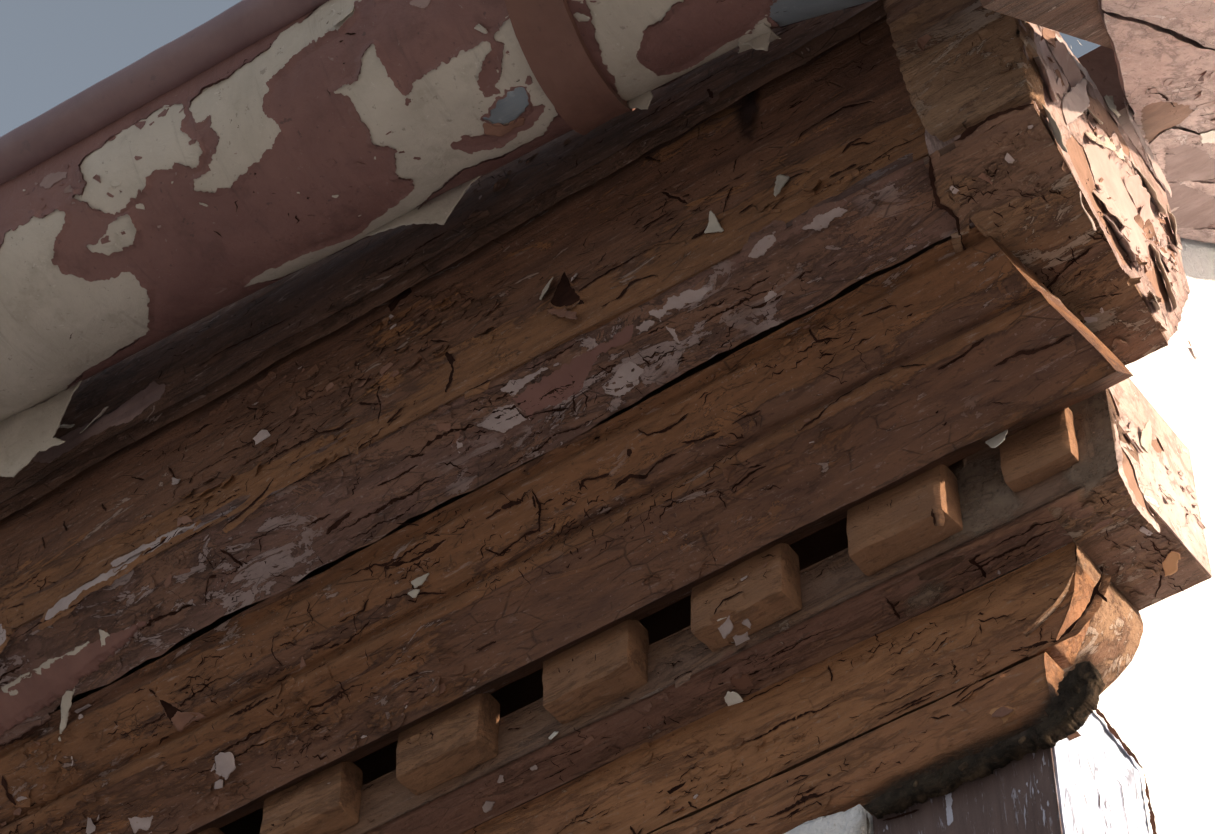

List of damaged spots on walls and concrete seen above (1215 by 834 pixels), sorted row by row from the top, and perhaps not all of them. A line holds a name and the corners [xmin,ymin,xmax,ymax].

peeling [573,0,875,102]
peeling [0,0,366,422]
peeling [236,7,561,290]
peeling [1022,22,1215,313]
peeling [27,377,173,469]
peeling [469,276,724,437]
crack [107,60,1143,834]
peeling [1116,440,1160,533]
peeling [38,515,201,630]
crack [0,713,133,834]
peeling [0,614,152,741]
mould [866,656,1096,810]